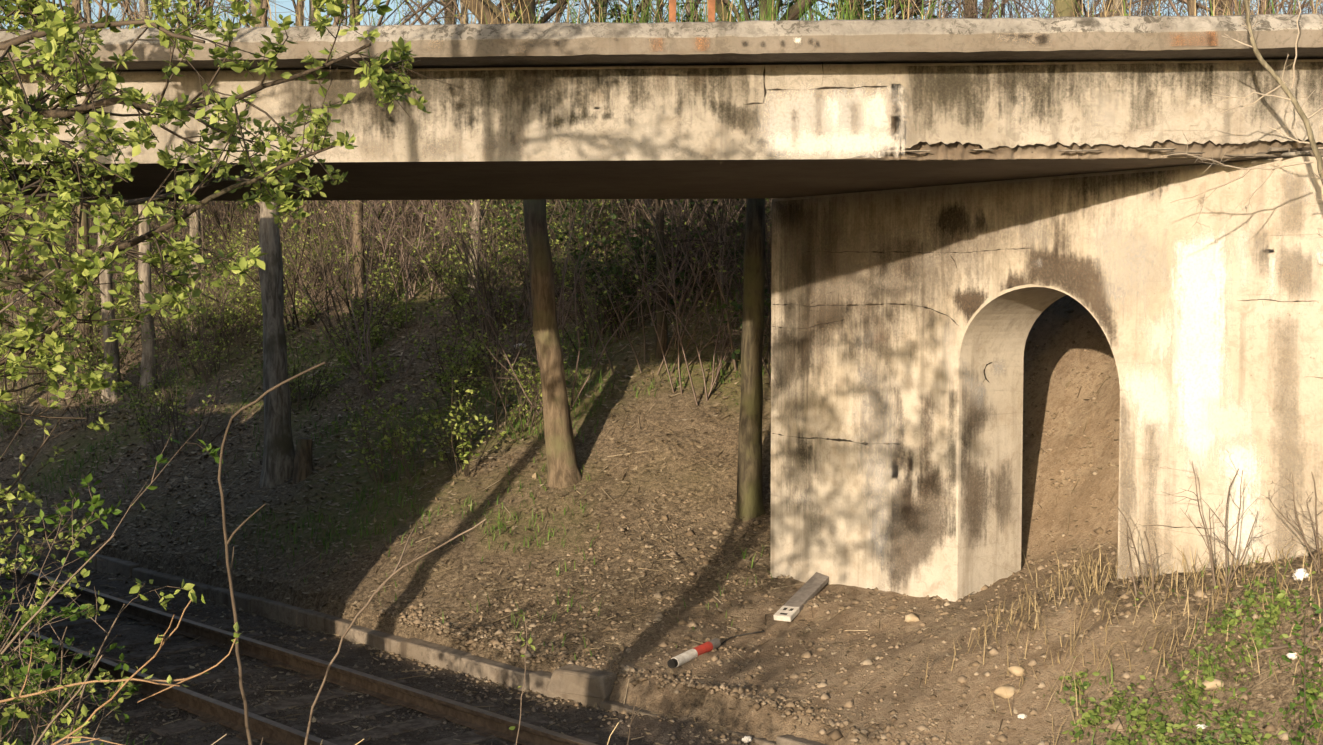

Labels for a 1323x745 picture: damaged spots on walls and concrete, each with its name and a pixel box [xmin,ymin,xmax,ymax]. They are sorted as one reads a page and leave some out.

leakage [297,69,644,128]
leakage [687,68,747,96]
leakage [722,87,902,158]
spalling [849,139,1323,160]
leakage [936,205,987,235]
leakage [955,290,987,318]
leakage [1002,226,1116,342]
leakage [888,394,986,586]